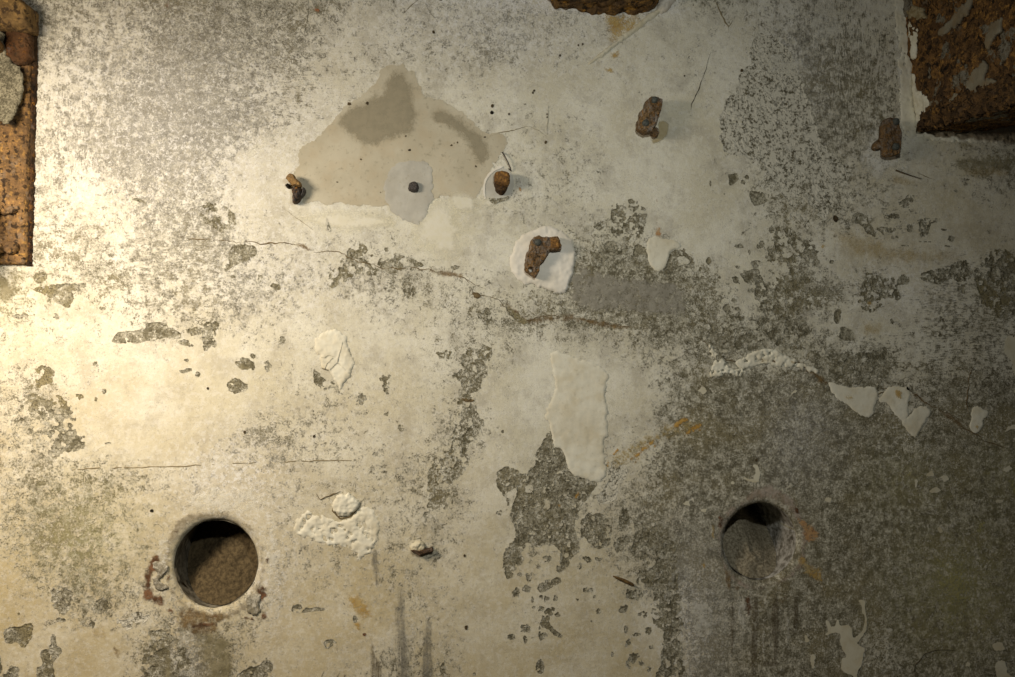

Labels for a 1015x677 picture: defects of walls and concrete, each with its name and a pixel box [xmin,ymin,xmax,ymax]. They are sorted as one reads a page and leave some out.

leakage [340,76,415,144]
leakage [435,112,487,162]
peeling [112,321,219,351]
peeling [472,292,492,325]
peeling [227,353,272,394]
peeling [423,345,492,522]
peeling [496,431,686,677]
corrosion [143,555,223,634]